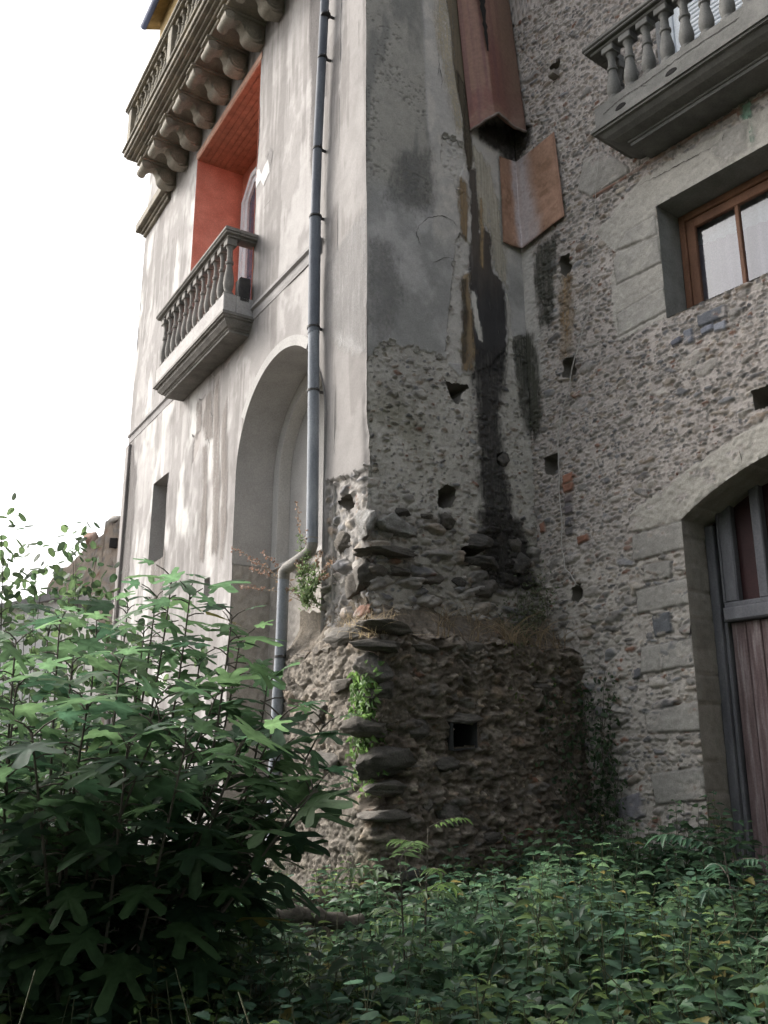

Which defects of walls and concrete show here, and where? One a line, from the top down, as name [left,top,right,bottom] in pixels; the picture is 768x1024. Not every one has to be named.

flaking render [320,232,560,636]
water stain [437,0,543,591]
water stain [534,236,557,326]